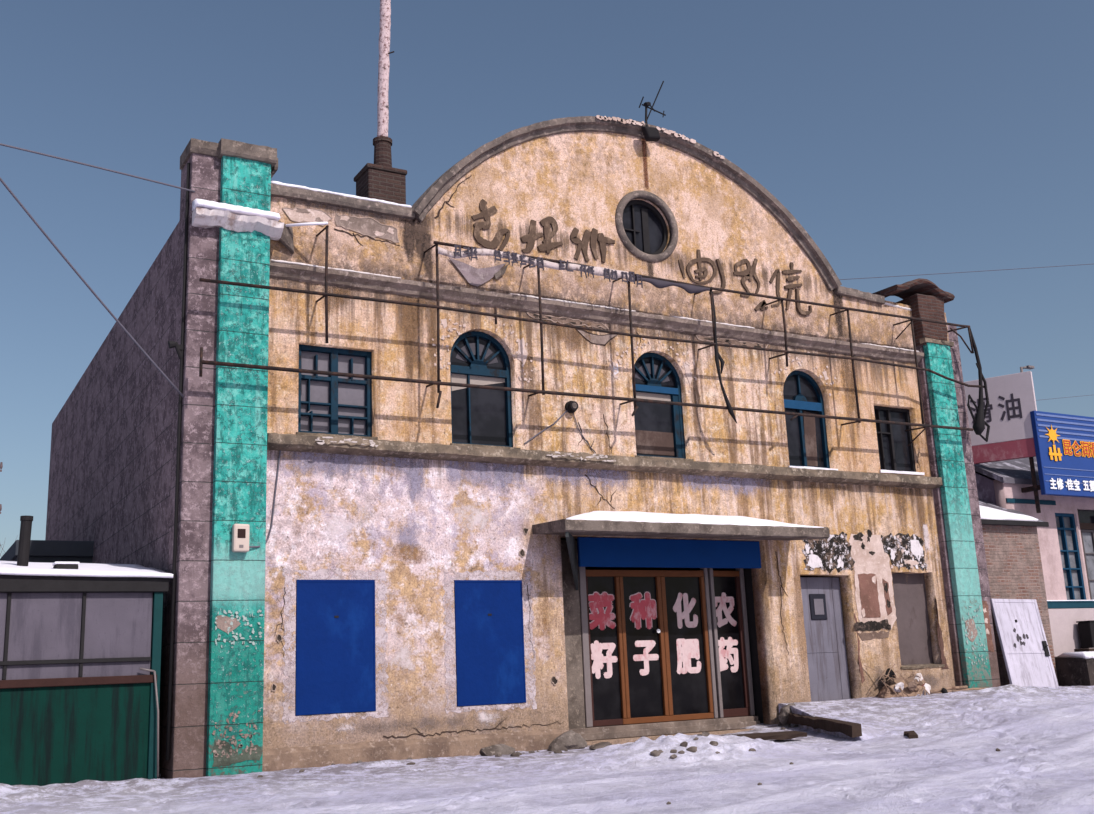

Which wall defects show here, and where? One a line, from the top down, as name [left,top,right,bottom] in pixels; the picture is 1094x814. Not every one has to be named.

flaking render [282,207,399,243]
crack [434,176,471,219]
damp [402,298,437,393]
damp [691,370,699,432]
crack [578,414,616,509]
peeling [215,609,263,649]
peeling [802,529,927,683]
peeling [212,711,262,767]
crack [383,719,563,738]